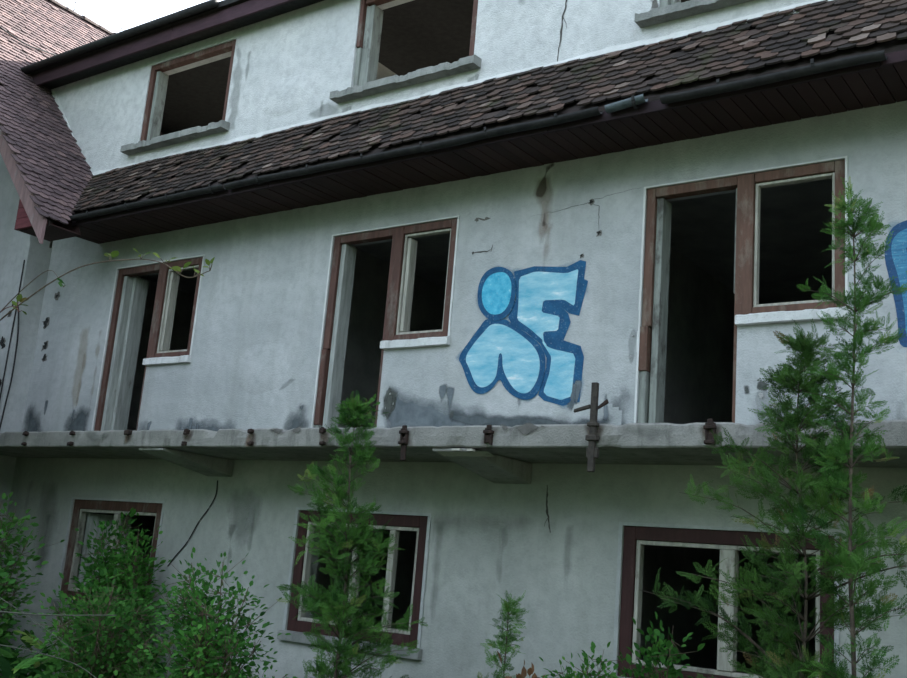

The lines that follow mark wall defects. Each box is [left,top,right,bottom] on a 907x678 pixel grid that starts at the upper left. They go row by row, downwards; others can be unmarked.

crack [557,0,567,61]
rust [536,164,553,197]
water stain [25,401,48,432]
water stain [66,409,88,431]
water stain [382,385,564,428]
water stain [568,380,581,409]